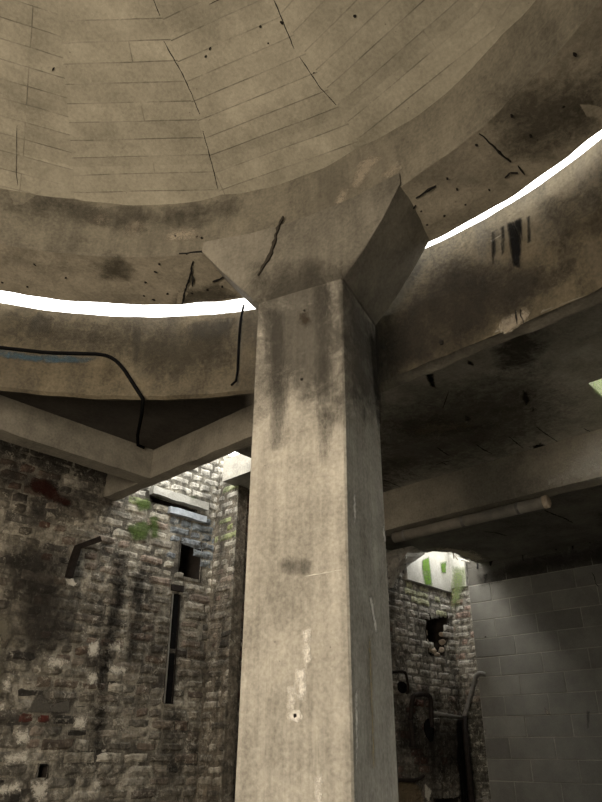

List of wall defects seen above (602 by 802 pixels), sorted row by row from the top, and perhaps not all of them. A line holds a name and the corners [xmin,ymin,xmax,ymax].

crack [274,1,336,105]
crack [164,42,200,114]
crack [479,133,525,178]
crack [413,185,436,209]
crack [257,216,284,276]
damp [492,216,530,267]
crack [179,251,224,304]
spalling [425,613,449,658]
damp [47,657,68,668]
damp [5,730,30,764]
damp [0,782,21,795]
damp [31,781,48,802]